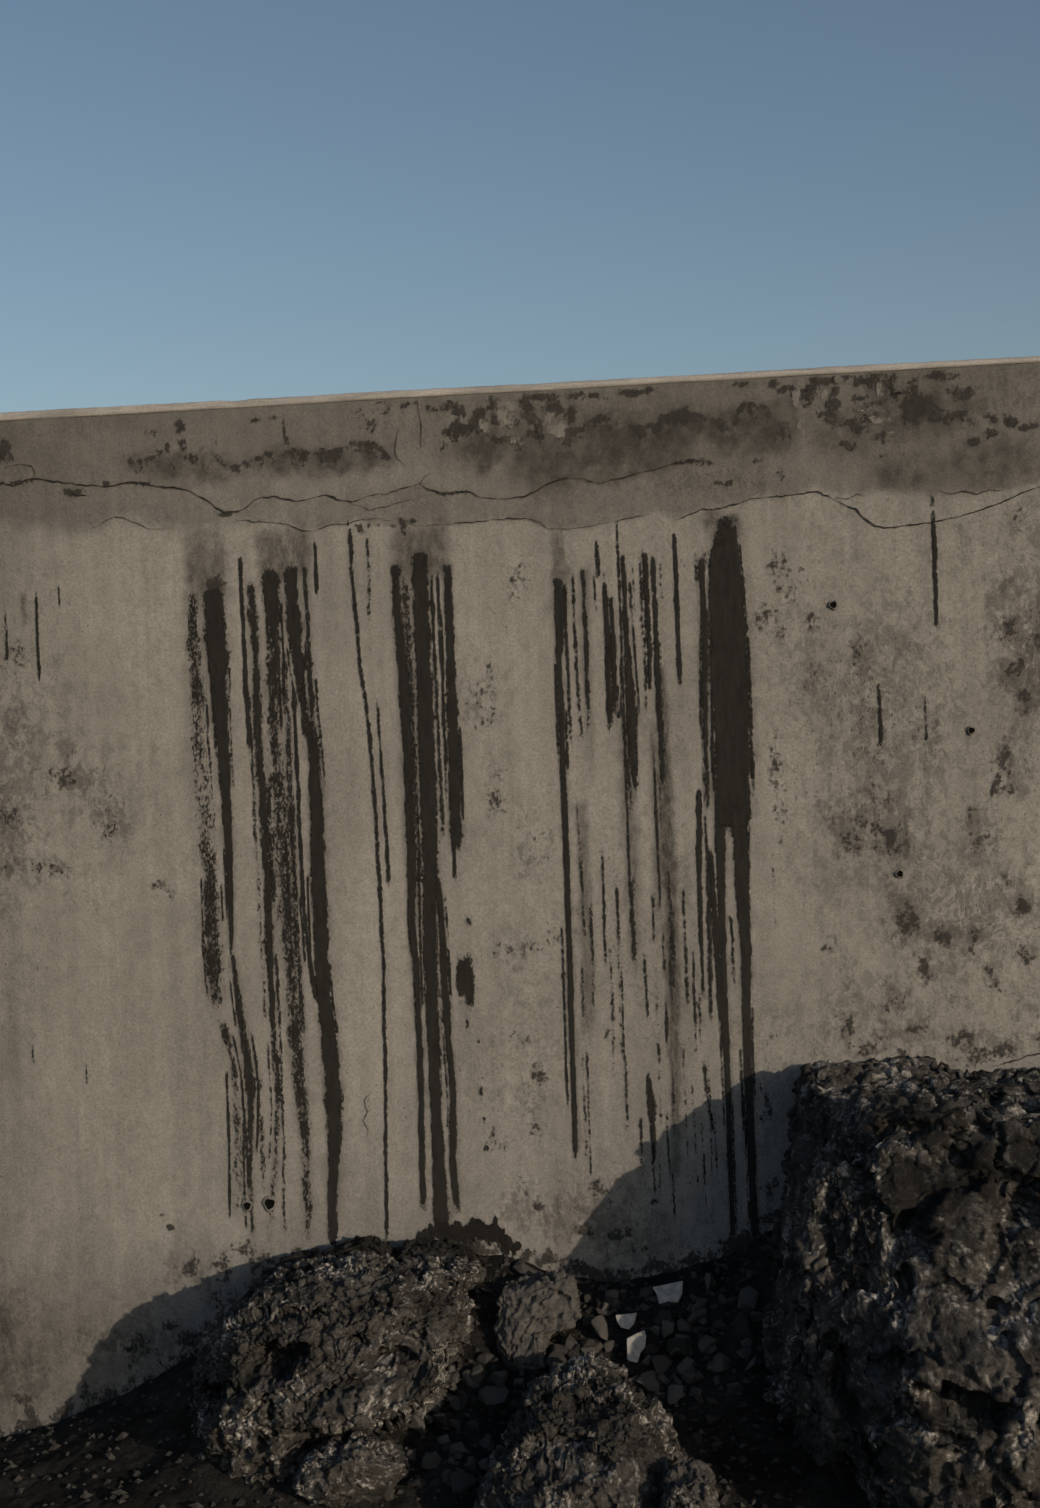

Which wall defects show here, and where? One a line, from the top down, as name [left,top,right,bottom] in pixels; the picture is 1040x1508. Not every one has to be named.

water stain [0,438,14,462]
water stain [128,415,391,476]
crack [0,402,715,531]
water stain [581,381,791,476]
water stain [967,412,1039,446]
crack [677,486,1040,529]
water stain [833,777,910,856]
water stain [347,517,496,1244]
water stain [463,513,809,1282]
water stain [0,533,344,1438]
water stain [833,1010,928,1056]
water stain [942,1030,1018,1068]